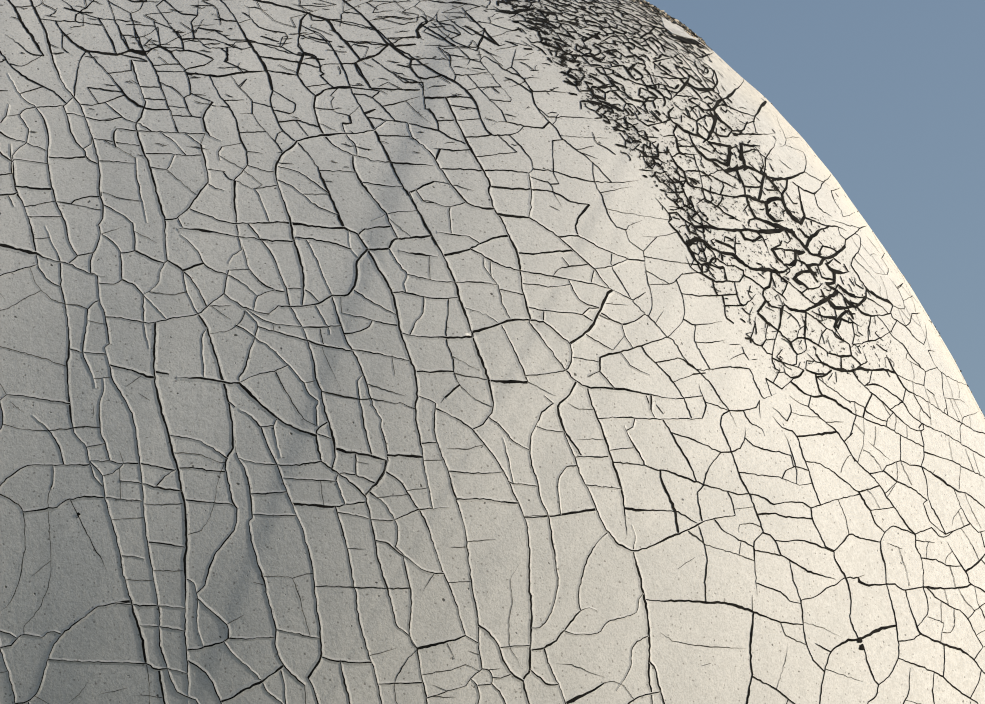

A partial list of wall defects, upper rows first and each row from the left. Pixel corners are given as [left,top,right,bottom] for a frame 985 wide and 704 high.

crack [934,396,985,434]
crack [5,547,26,608]
crack [660,632,730,648]